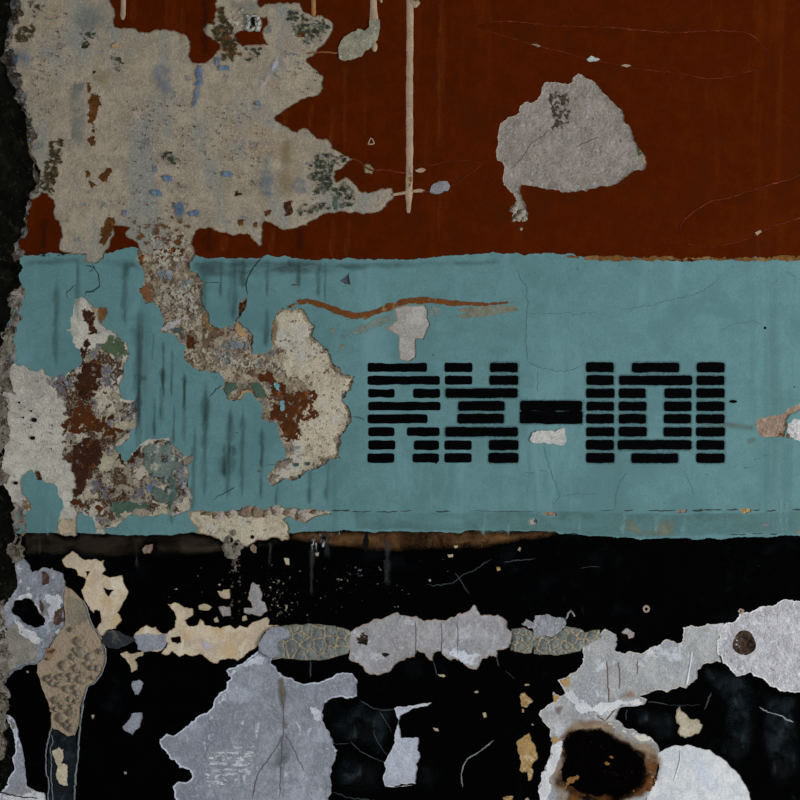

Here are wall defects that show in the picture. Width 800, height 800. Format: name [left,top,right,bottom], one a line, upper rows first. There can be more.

peeling [0,0,395,486]
corrosion [287,297,519,349]
flaking render [496,74,647,231]
peeling [0,284,358,800]
flaking render [349,605,512,675]
flaking render [516,599,800,800]